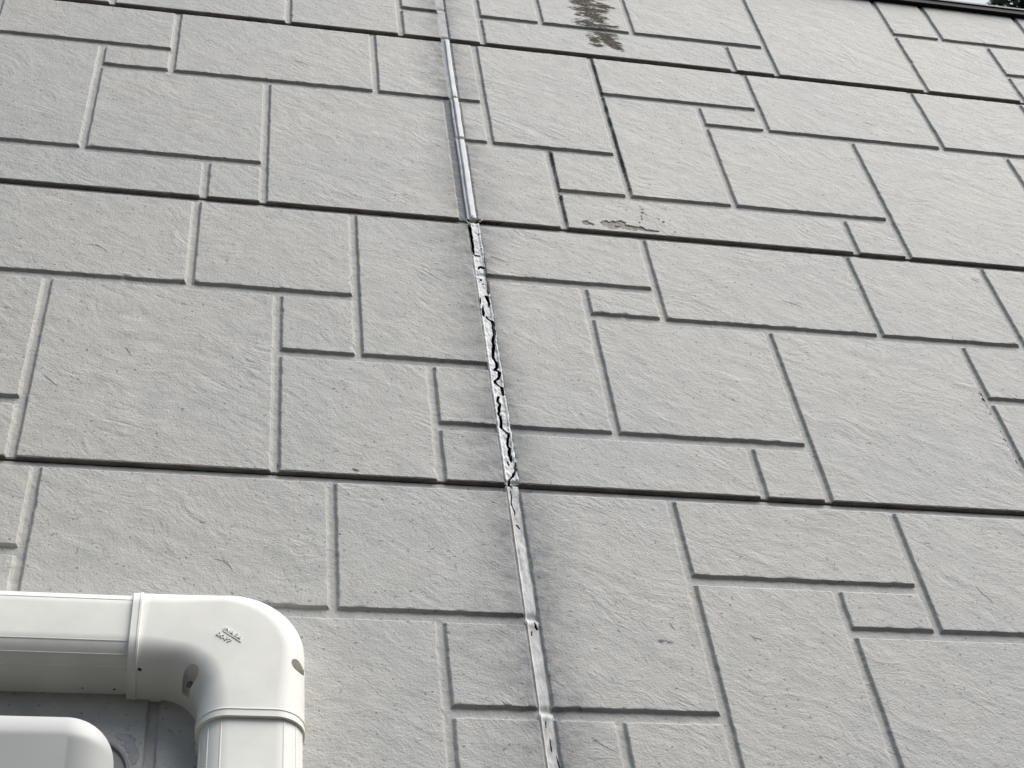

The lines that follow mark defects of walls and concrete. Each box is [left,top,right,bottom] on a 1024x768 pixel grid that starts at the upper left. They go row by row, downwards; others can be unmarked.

spalling [582,220,659,232]
crack [479,296,520,530]